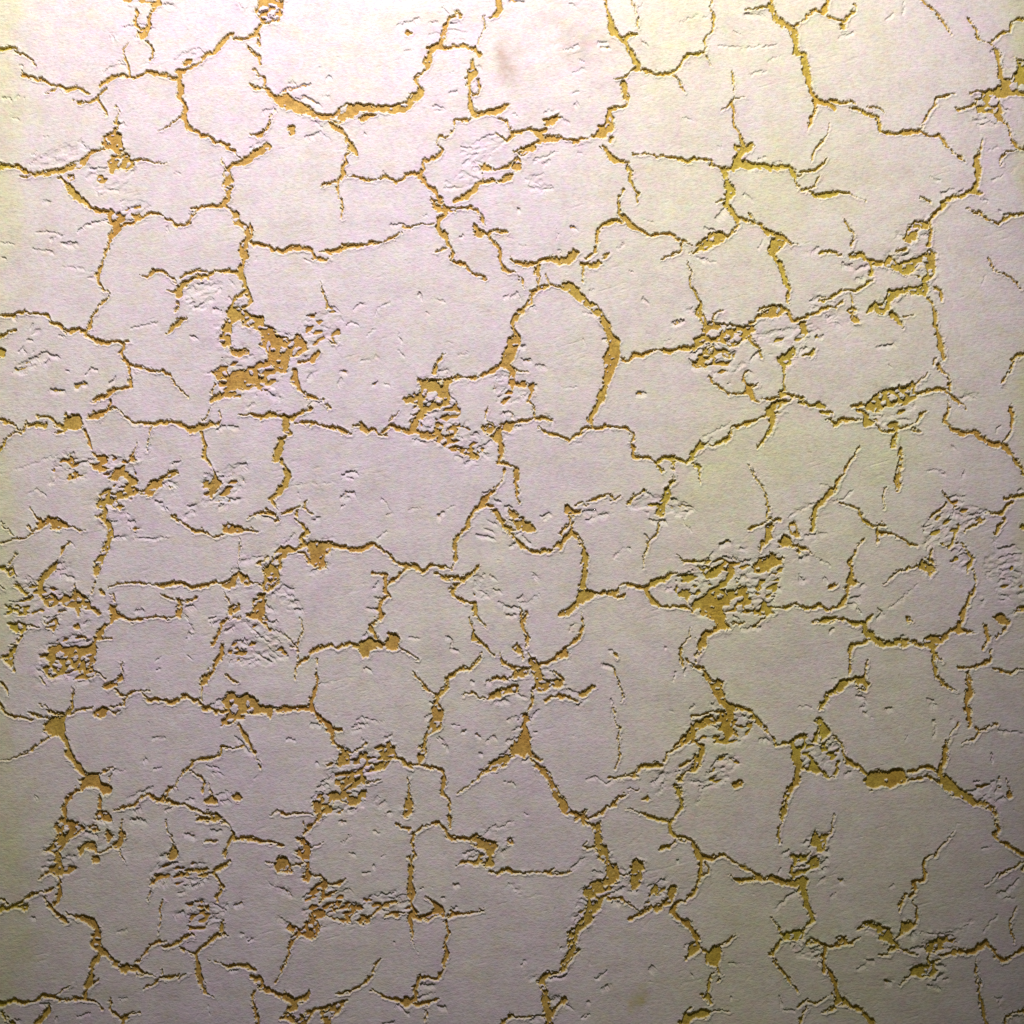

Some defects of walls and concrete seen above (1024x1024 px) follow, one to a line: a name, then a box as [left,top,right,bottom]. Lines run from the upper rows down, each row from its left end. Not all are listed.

crack [744,0,1024,227]
spalling [183,281,391,520]
crack [0,0,929,620]
spalling [401,341,555,505]
spalling [663,202,949,377]
crack [926,296,1024,536]
spalling [0,428,195,697]
spalling [644,502,832,618]
crack [0,566,818,931]
crack [664,537,1024,945]
crack [0,822,485,1024]
spalling [264,716,711,1024]